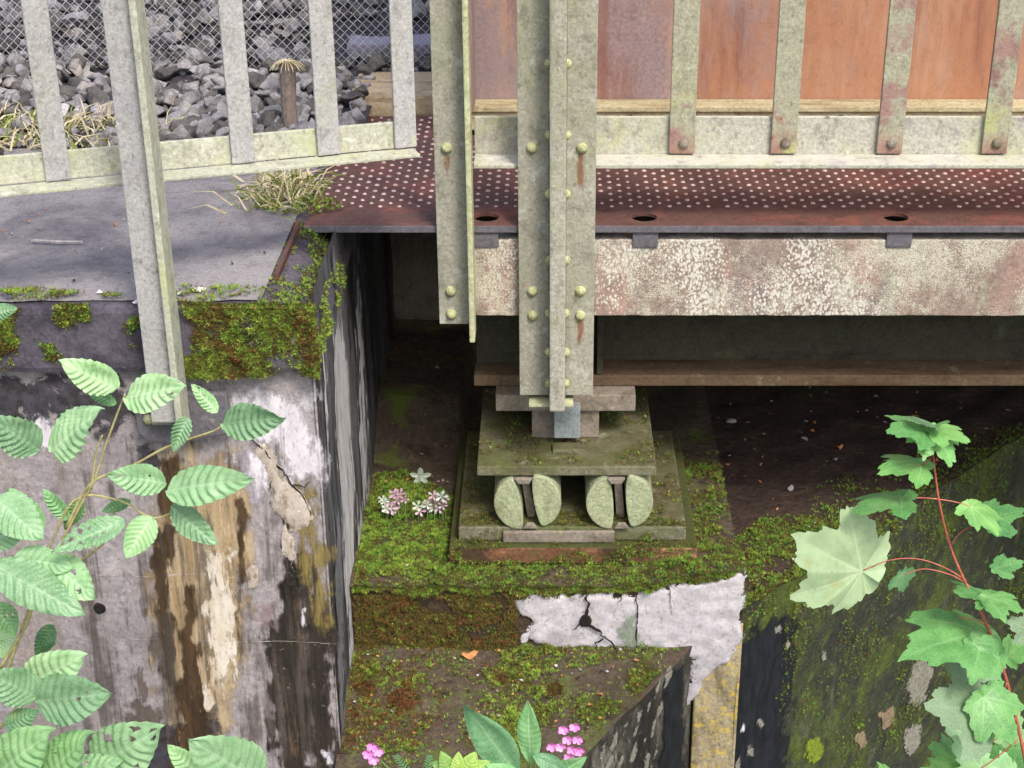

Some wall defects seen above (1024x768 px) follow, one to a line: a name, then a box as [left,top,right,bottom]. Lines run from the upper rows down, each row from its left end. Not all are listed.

damp [0,372,136,451]
damp [131,435,166,477]
crack [252,440,312,515]
peeling [255,442,315,565]
damp [223,247,370,768]
damp [80,590,122,754]
damp [138,594,187,768]
damp [195,543,222,736]
peeling [245,565,259,589]
crack [572,590,639,650]